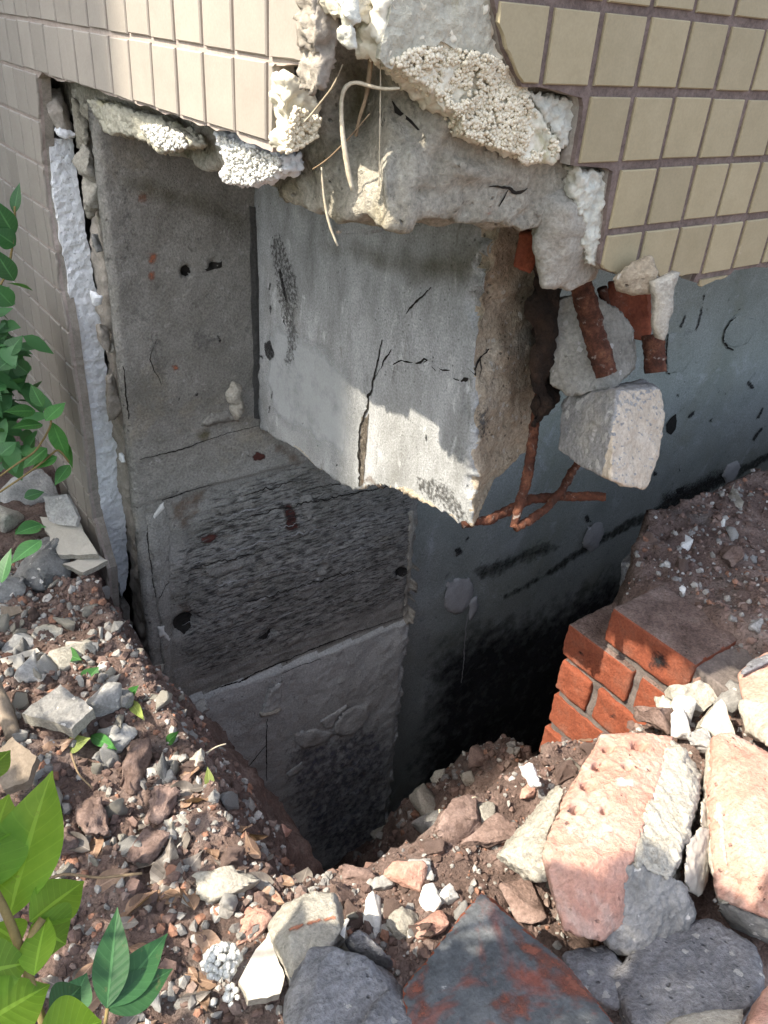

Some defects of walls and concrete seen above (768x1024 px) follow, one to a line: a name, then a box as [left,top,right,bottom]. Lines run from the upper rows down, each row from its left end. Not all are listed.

peeling [259,235,297,365]
crack [406,287,431,314]
corrosion [571,281,617,379]
corrosion [641,334,667,374]
crack [357,340,489,486]
corrosion [461,411,606,532]
water stain [599,453,768,543]
peeling [158,467,420,675]
water stain [477,545,587,598]